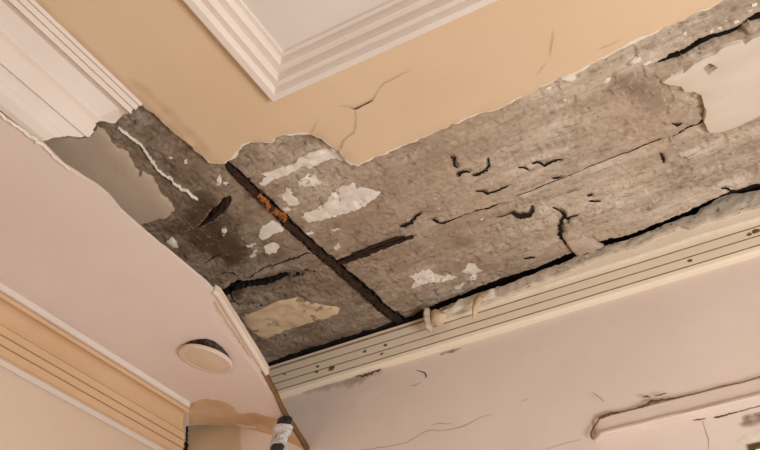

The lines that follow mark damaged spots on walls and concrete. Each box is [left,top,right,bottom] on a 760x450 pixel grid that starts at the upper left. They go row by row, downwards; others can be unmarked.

crack [341,71,410,149]
spalling [93,0,760,364]
crack [400,119,703,228]
crack [553,194,601,255]
crack [363,414,492,450]
crack [547,376,760,449]